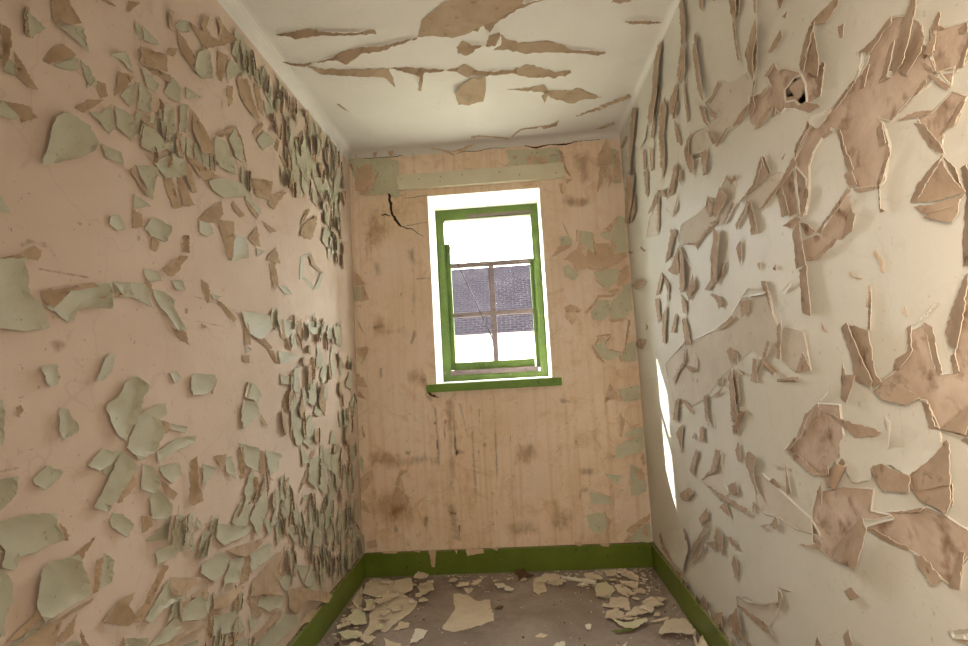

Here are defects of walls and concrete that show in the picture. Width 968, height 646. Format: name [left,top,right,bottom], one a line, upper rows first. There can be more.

peeling [0,0,403,344]
crack [382,193,427,236]
peeling [277,0,968,646]
peeling [0,399,24,446]
peeling [59,408,79,440]
peeling [89,279,436,646]
peeling [0,476,115,646]